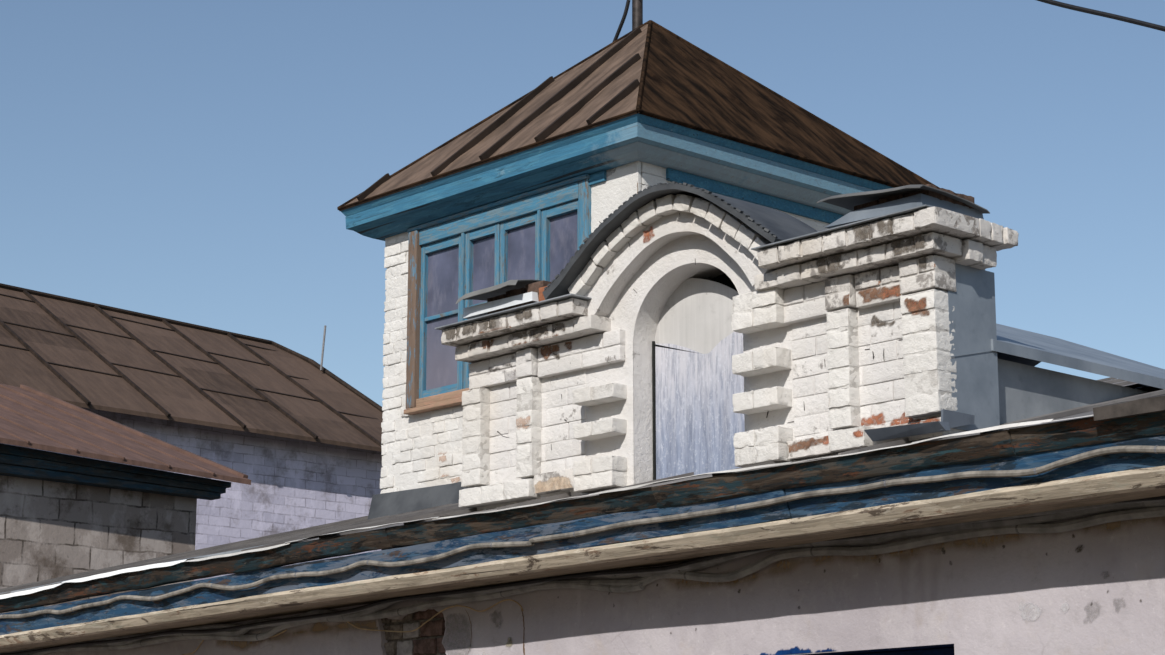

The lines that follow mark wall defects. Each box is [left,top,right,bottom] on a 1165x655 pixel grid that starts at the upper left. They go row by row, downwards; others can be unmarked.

peeling [829,284,929,315]
peeling [445,318,496,351]
peeling [512,309,572,360]
peeling [871,315,895,327]
peeling [853,412,939,437]
peeling [788,436,829,452]
flaking render [534,476,572,493]
flaking render [381,609,446,655]